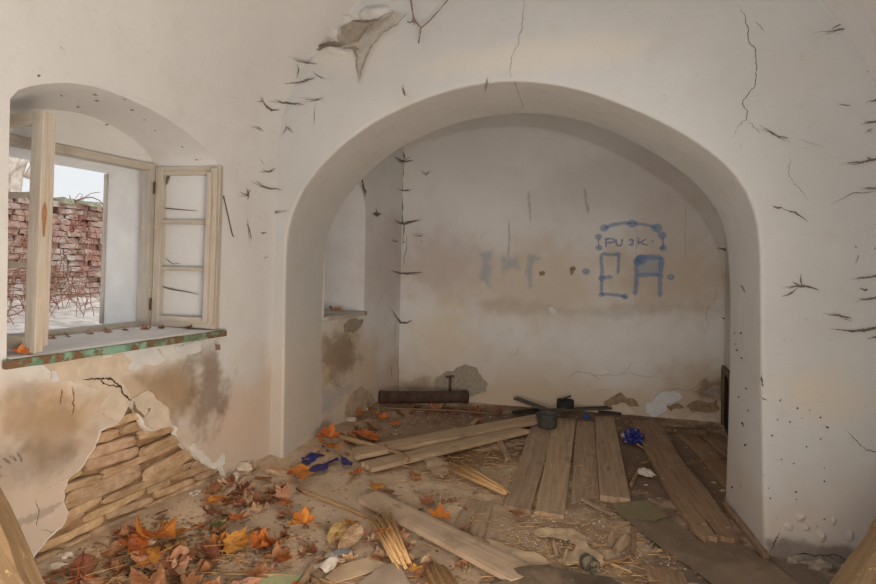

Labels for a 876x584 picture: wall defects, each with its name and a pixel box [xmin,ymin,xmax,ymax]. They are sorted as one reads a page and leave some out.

spalling [341,12,392,43]
crack [734,4,763,135]
crack [83,377,132,401]
spalling [434,364,488,397]
flaking render [603,385,721,422]
spalling [33,347,226,563]